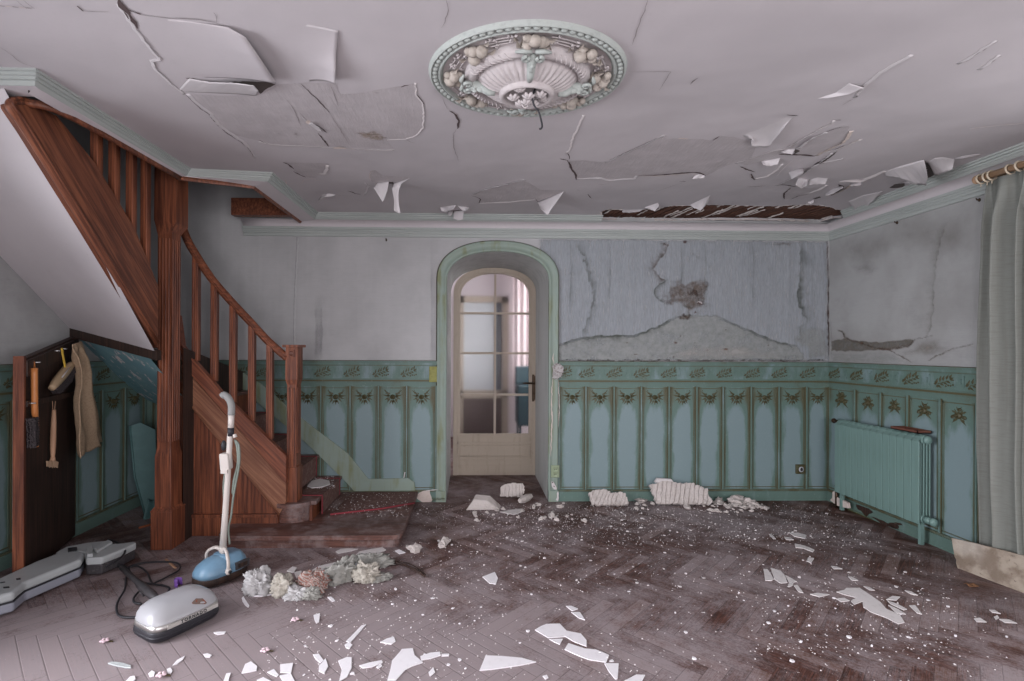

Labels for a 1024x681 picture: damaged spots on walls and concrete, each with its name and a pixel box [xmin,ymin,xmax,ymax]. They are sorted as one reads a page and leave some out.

peeling [116,0,425,158]
peeling [369,170,410,213]
crack [443,100,460,158]
peeling [440,179,564,220]
peeling [562,115,980,222]
water stain [541,239,937,361]